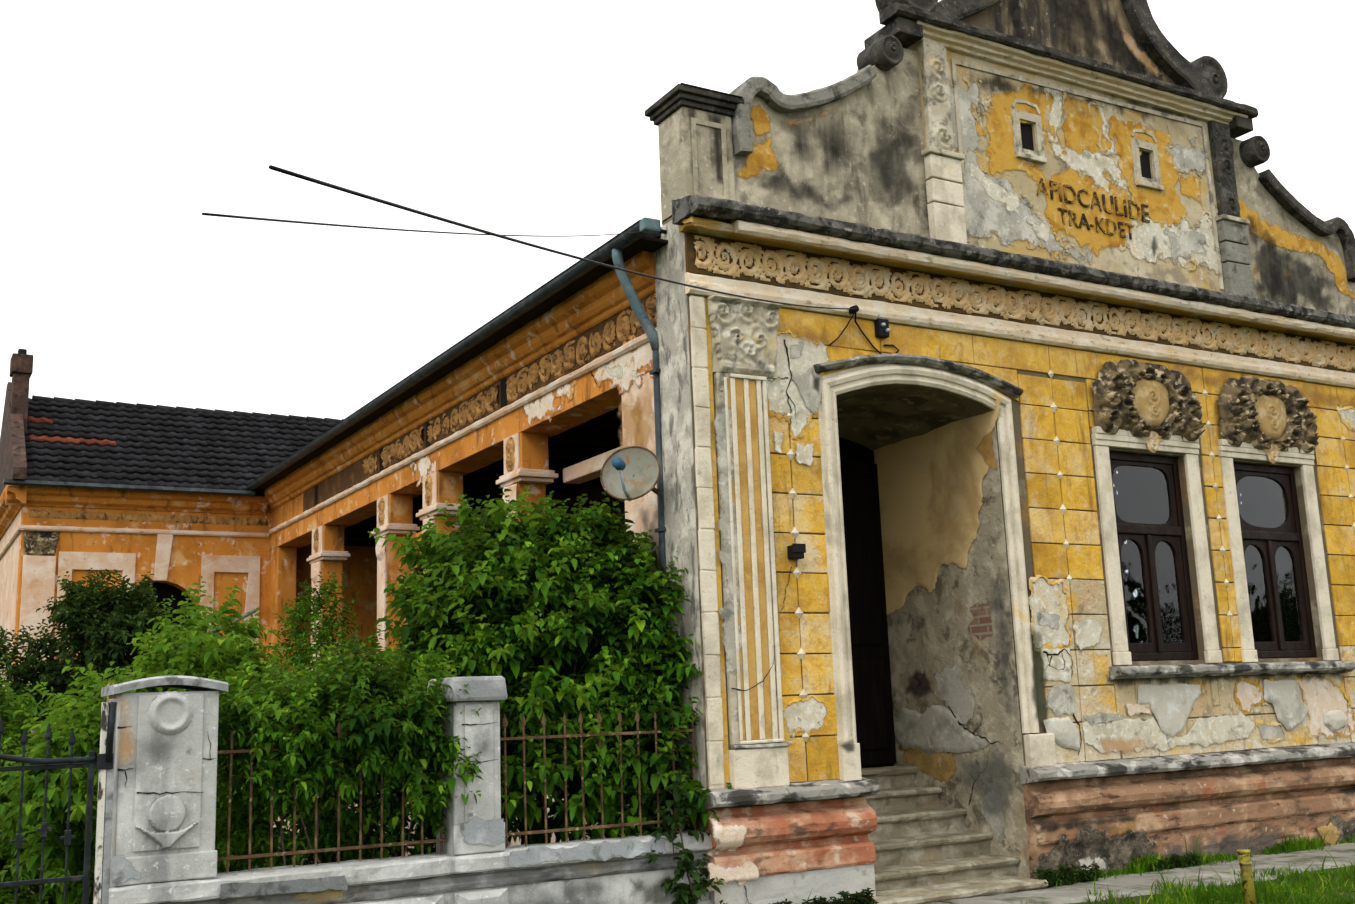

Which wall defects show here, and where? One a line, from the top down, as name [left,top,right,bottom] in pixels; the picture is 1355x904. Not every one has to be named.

water stain [765,169,827,205]
water stain [825,132,844,168]
water stain [870,120,913,197]
flaking render [949,74,1094,265]
peeling [1043,82,1129,194]
flaking render [1119,208,1223,275]
water stain [1250,225,1329,311]
peeling [594,333,653,395]
flaking render [1028,575,1287,753]
peeling [782,695,831,745]
peeling [1294,674,1355,739]
flaking render [707,817,759,891]